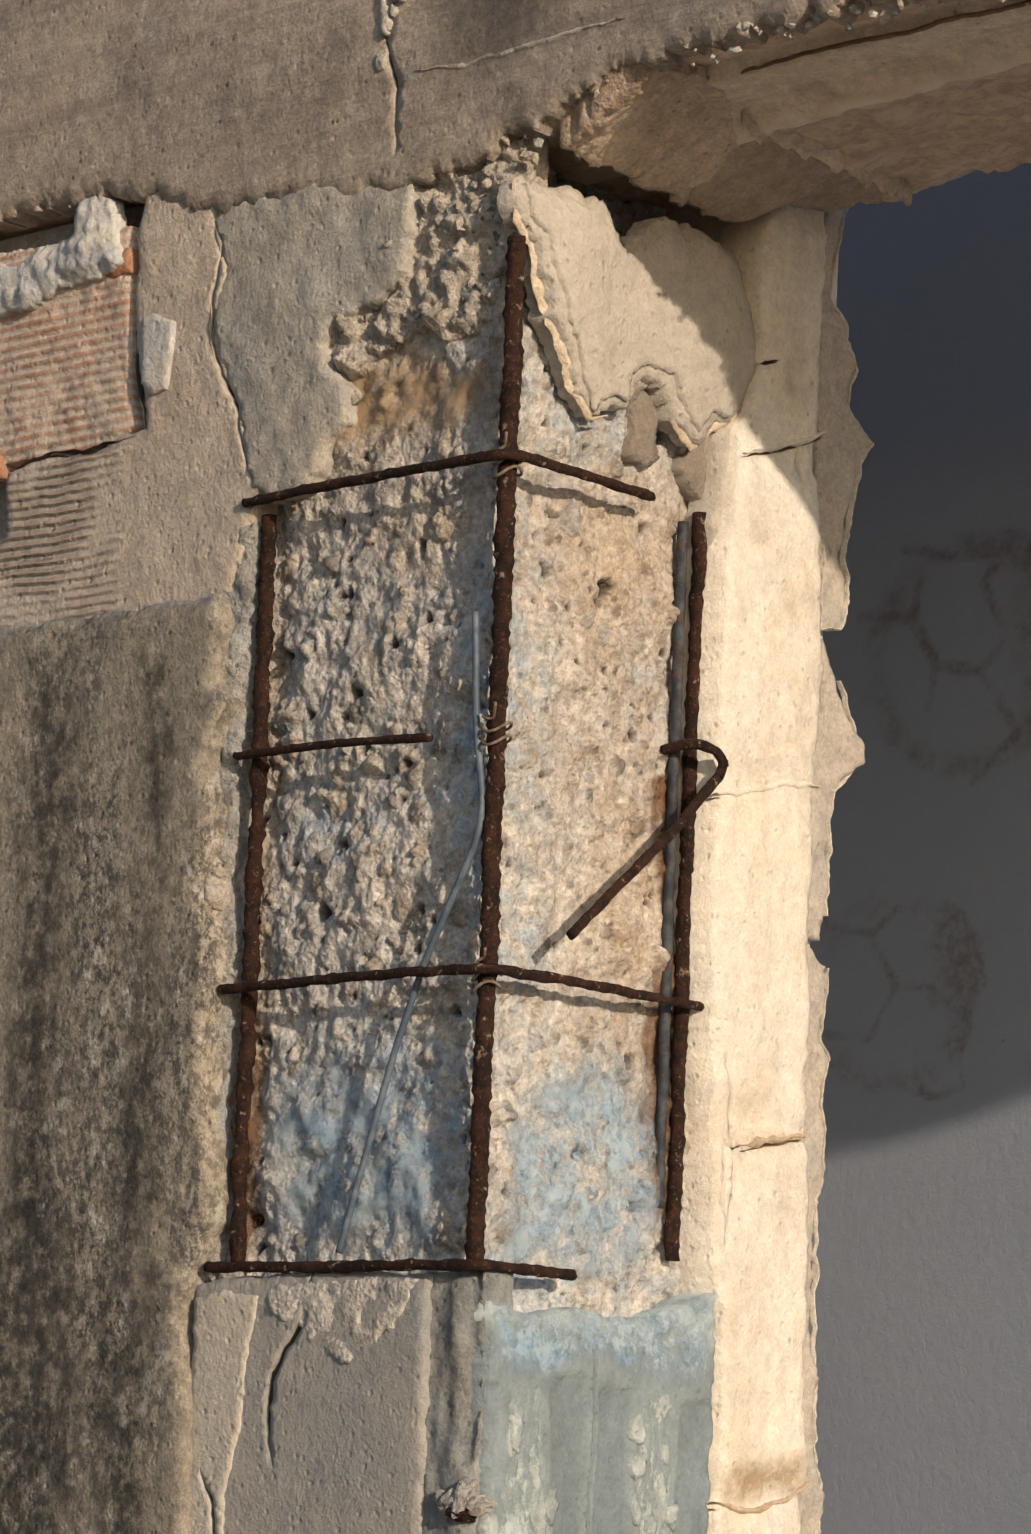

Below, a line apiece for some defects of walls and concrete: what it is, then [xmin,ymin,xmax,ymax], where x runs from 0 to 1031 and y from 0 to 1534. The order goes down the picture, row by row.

crack [387,40,399,98]
spalling [690,0,960,66]
crack [741,0,1031,74]
spalling [105,247,140,279]
spalling [189,134,756,1534]
corrosion [653,775,668,893]
damp [0,682,78,1534]
damp [117,1030,155,1253]
corrosion [228,1064,262,1243]
corrosion [641,955,675,1216]
damp [96,1298,139,1534]
crack [268,1326,302,1447]